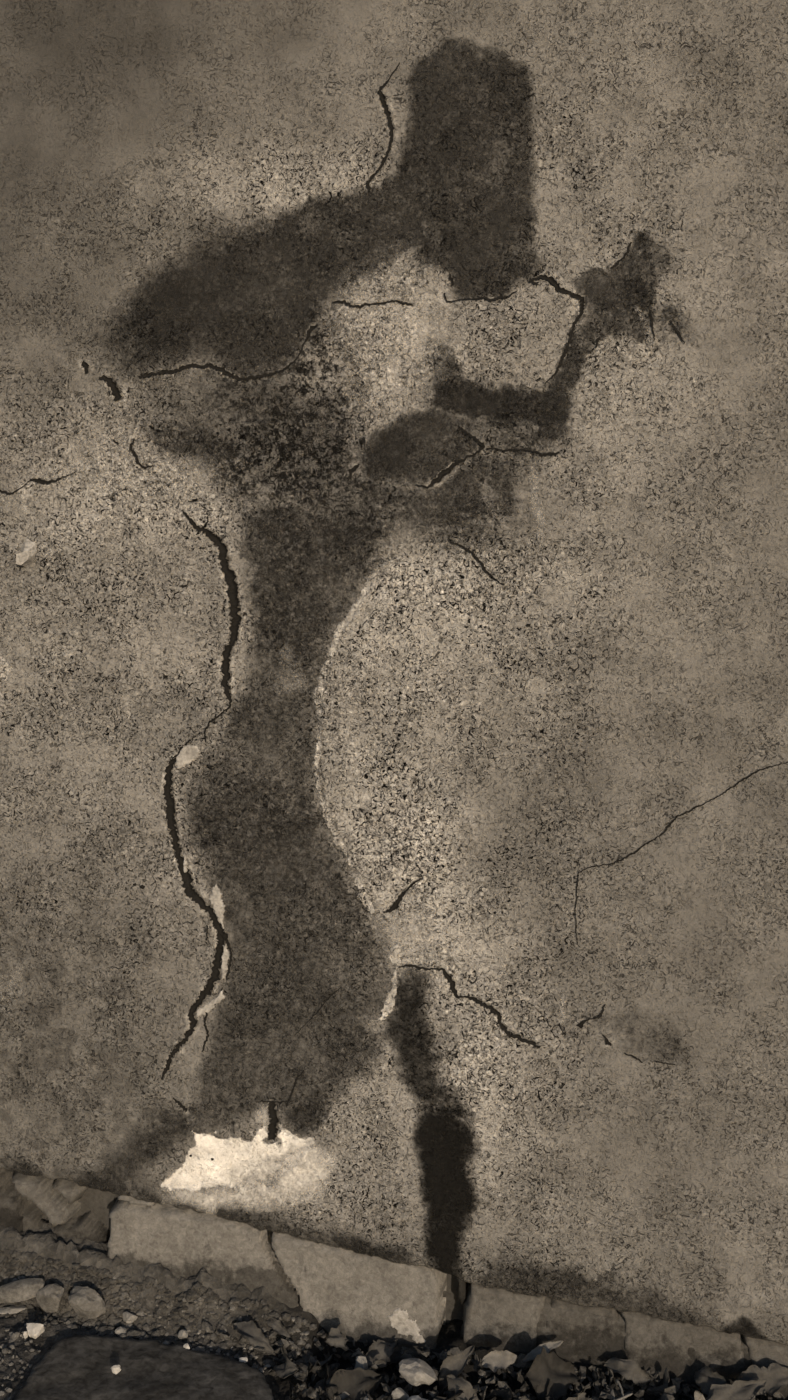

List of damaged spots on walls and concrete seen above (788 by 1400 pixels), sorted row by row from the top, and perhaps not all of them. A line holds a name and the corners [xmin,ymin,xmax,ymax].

crack [366,62,400,192]
water stain [78,39,682,1193]
crack [161,509,242,1113]
crack [399,964,541,1049]
spalling [161,1126,326,1210]
water stain [335,1238,394,1263]